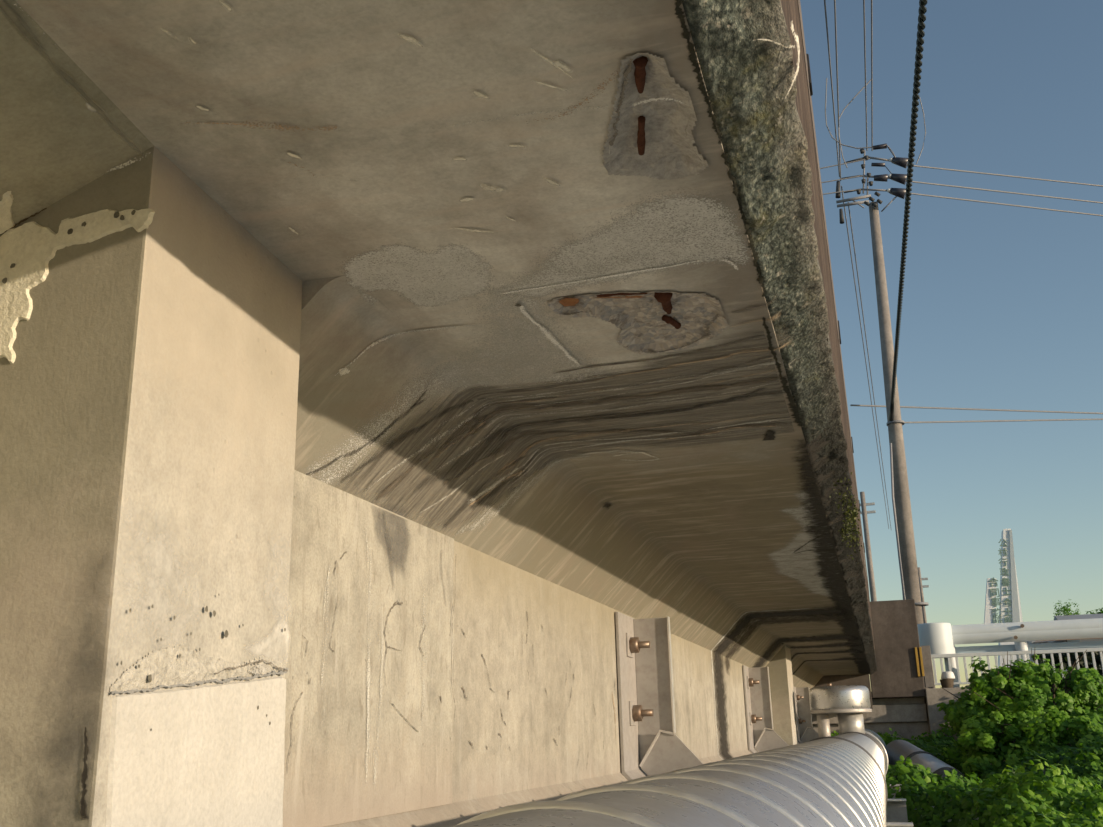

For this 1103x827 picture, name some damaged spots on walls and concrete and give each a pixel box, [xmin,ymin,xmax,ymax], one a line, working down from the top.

spalling [602,53,709,180]
water stain [753,21,800,98]
peeling [0,191,155,364]
spalling [547,291,729,355]
crack [675,0,803,426]
water stain [305,189,794,784]
water stain [711,428,875,759]
crack [287,679,311,773]
crack [384,600,426,731]